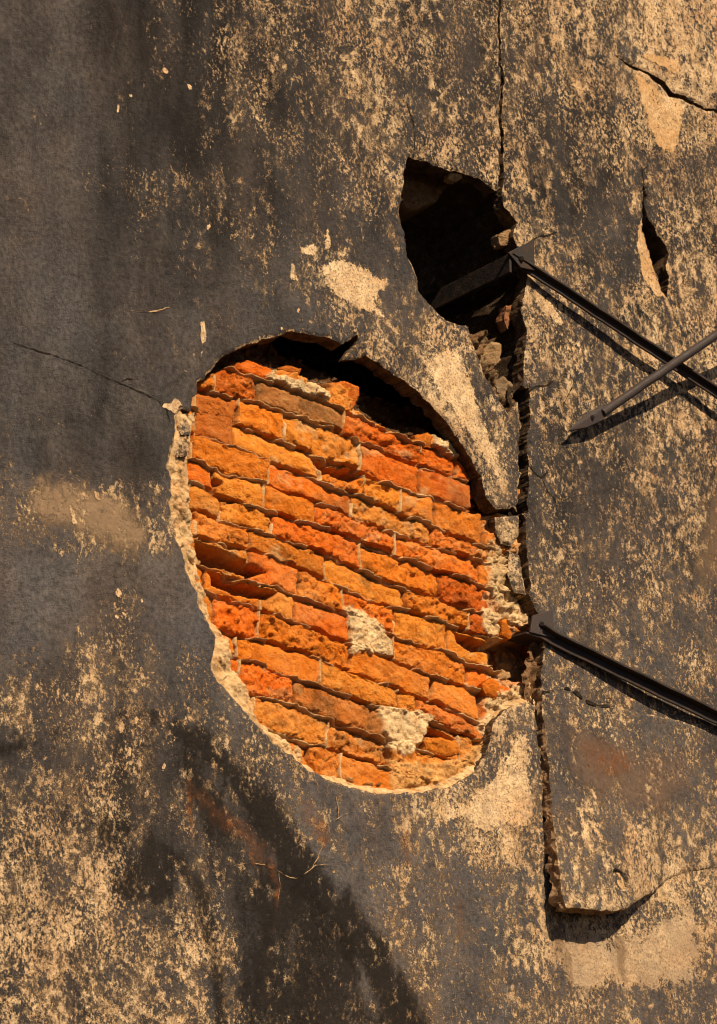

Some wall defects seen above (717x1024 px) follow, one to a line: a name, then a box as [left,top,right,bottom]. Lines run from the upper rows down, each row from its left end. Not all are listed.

crack [15,343,170,419]
flaking render [339,329,367,362]
spalling [398,166,520,495]
crack [500,371,574,522]
flaking render [162,342,536,837]
crack [521,641,612,707]